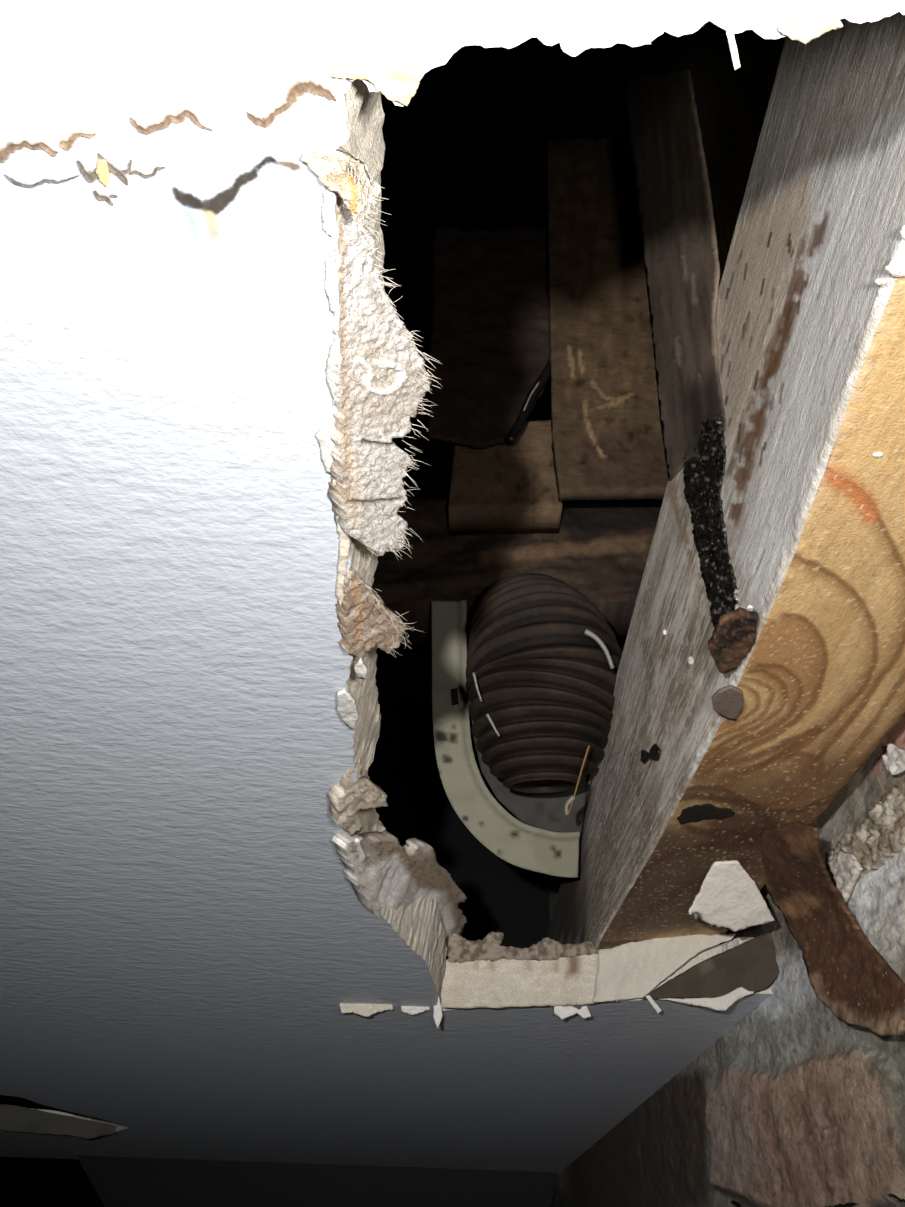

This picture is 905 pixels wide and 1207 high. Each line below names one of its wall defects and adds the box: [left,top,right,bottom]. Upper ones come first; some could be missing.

peeling [726,31,741,70]
crack [247,78,337,127]
crack [0,109,301,214]
spalling [316,146,441,679]
peeling [337,688,359,730]
flaking render [881,743,905,775]
spalling [327,762,662,1029]
flaking render [827,851,863,902]
crack [825,1199,861,1207]